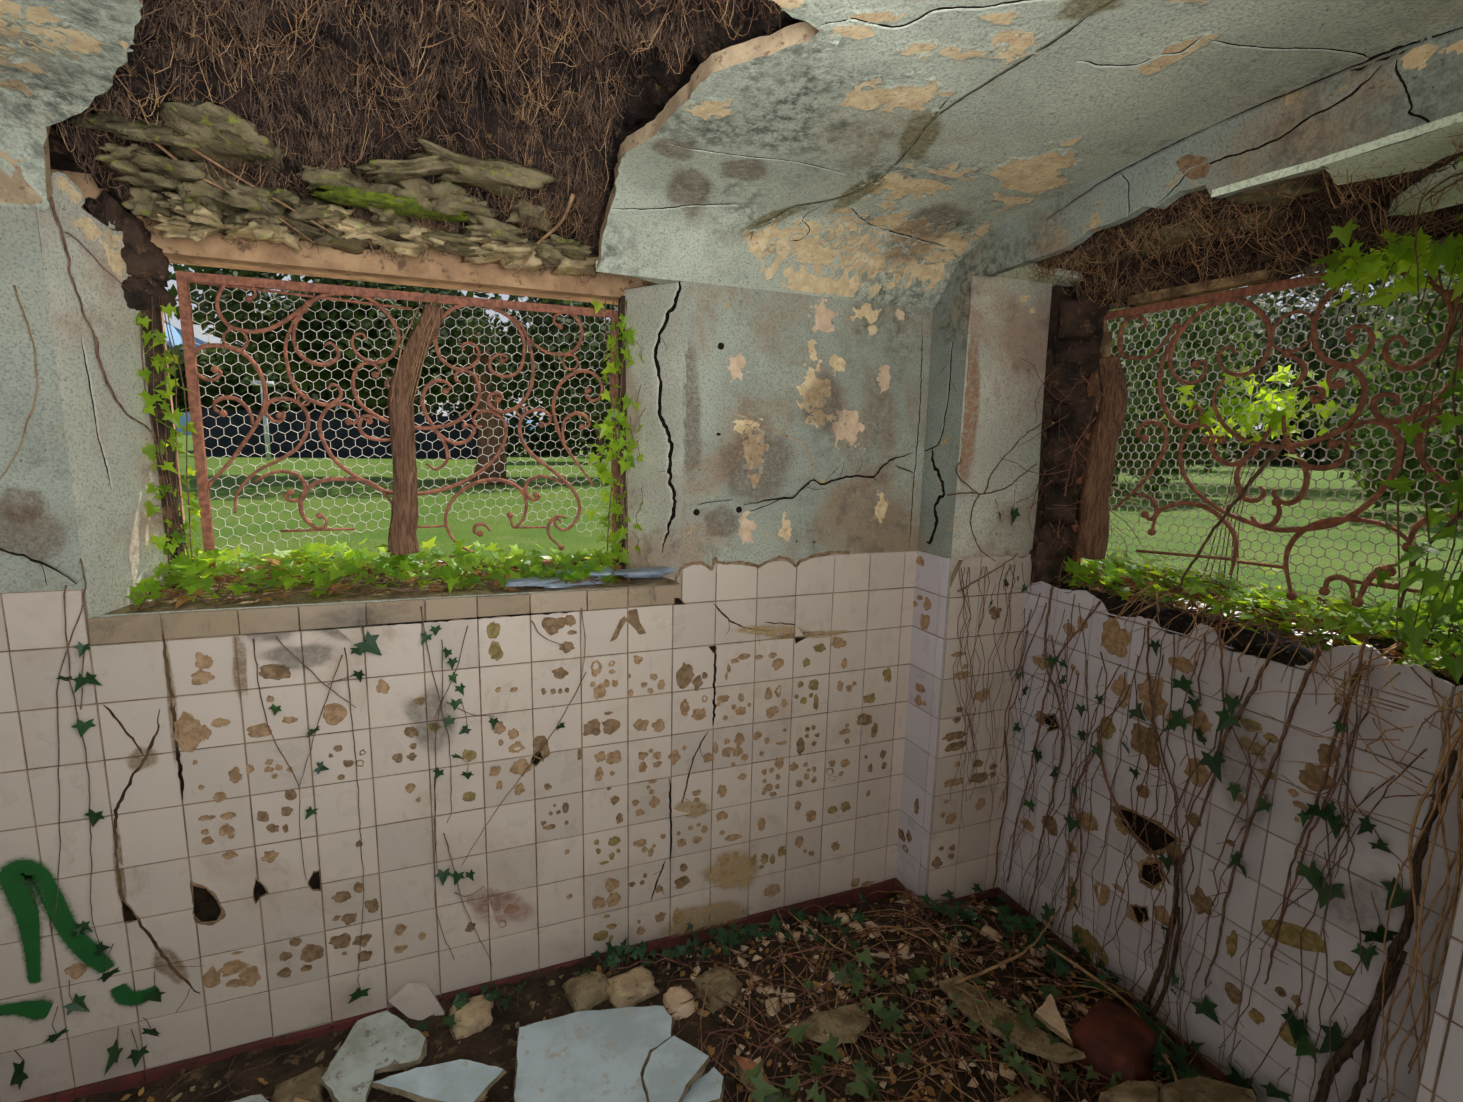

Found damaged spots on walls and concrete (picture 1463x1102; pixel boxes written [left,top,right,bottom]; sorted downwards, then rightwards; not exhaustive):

crack [612,0,1463,247]
peeling [0,144,132,293]
peeling [739,135,1085,452]
crack [650,281,956,553]
crack [0,542,81,585]
spalling [541,615,577,695]
crack [103,634,200,1013]
spalling [190,881,226,926]
spalling [198,759,297,863]
spalling [201,870,379,988]
spalling [577,637,892,942]
spalling [1066,785,1201,967]